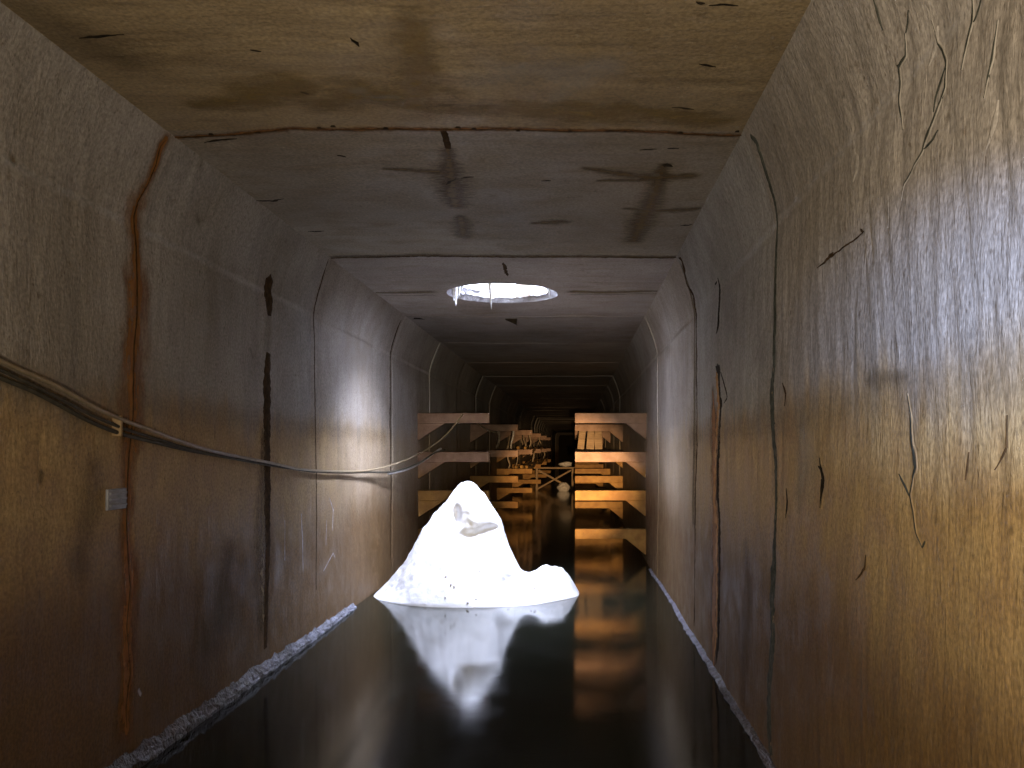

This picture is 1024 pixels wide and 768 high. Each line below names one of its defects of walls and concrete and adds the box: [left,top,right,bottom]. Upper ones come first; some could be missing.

crack [873,0,999,201]
crack [264,274,273,316]
crack [817,229,864,268]
crack [263,352,271,649]
rust [119,127,741,737]
crack [750,134,788,756]
crack [898,393,925,548]